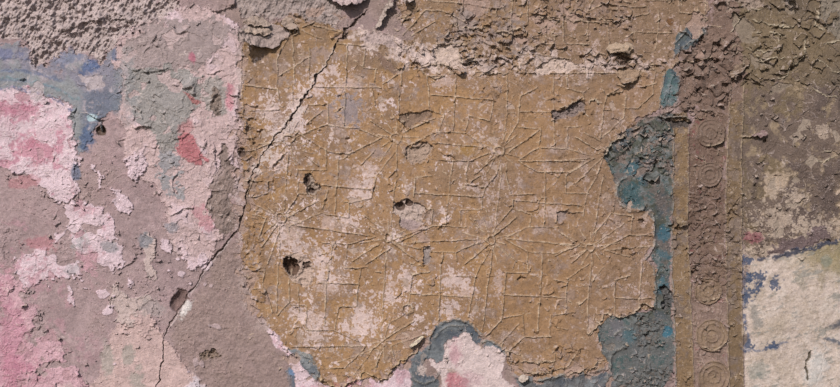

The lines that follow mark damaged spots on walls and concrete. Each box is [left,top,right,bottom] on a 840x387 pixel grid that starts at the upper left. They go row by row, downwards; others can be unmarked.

flaking render [360,0,406,75]
peeling [418,0,633,82]
crack [188,10,368,294]
peeling [534,0,840,261]
peeling [0,0,365,387]
crack [155,311,179,387]
peeling [267,327,608,387]
peeling [588,284,674,347]